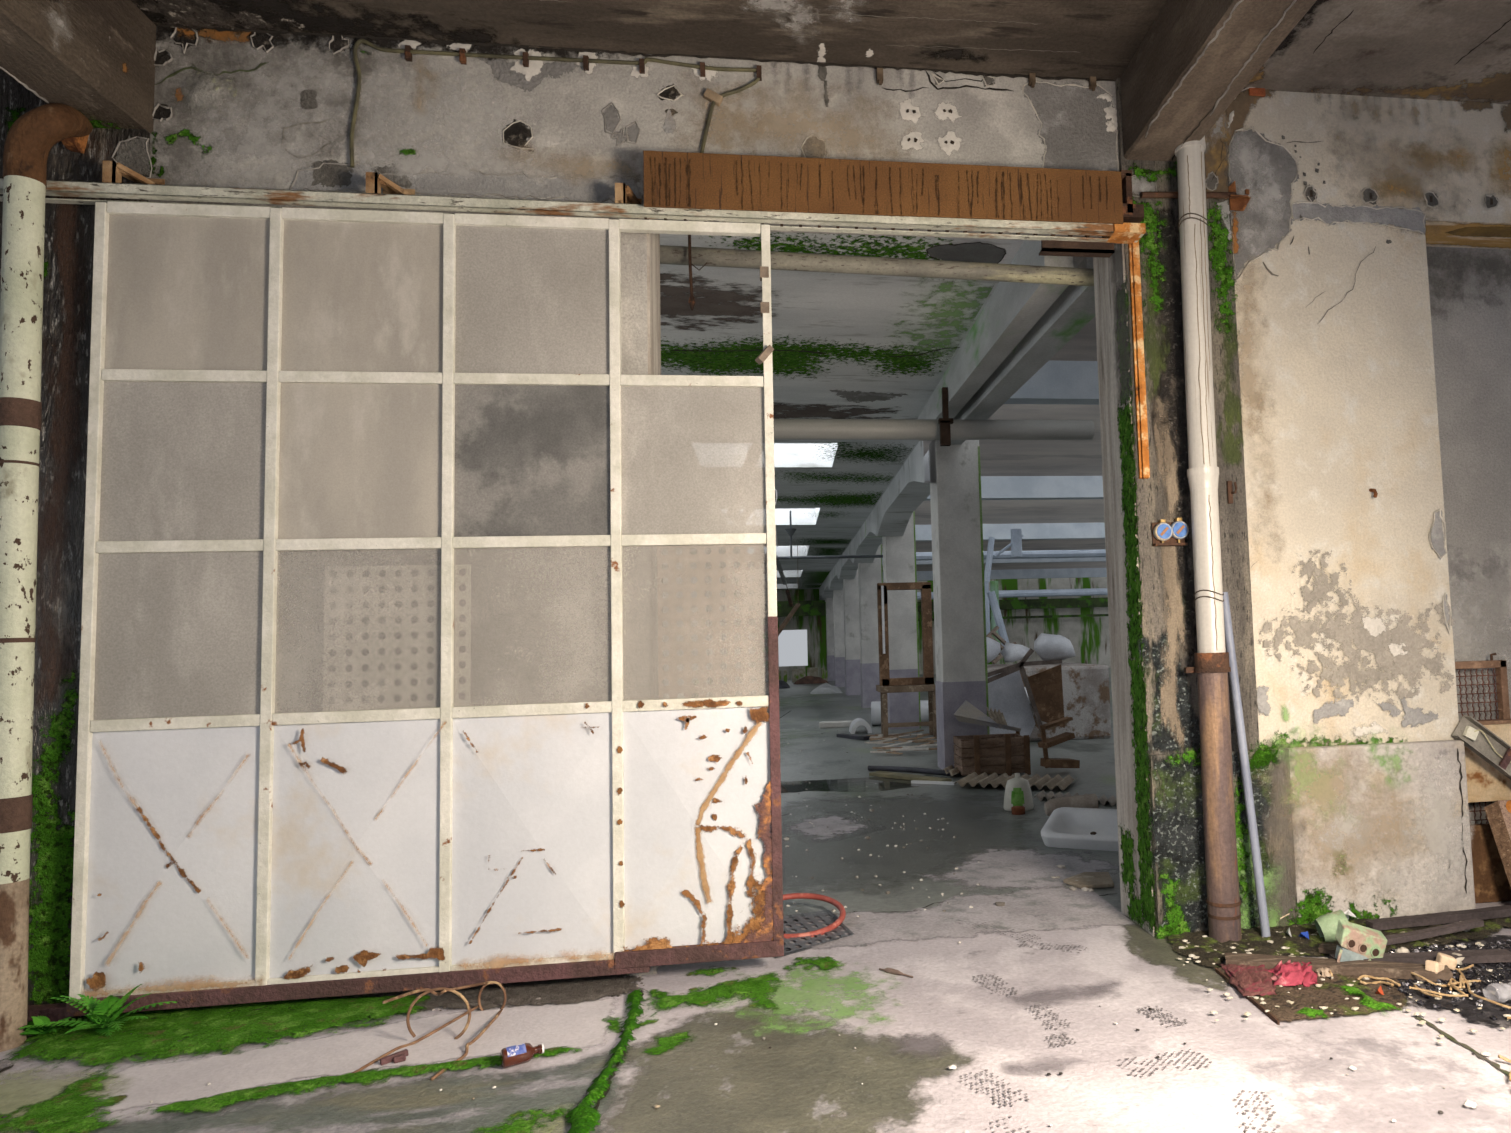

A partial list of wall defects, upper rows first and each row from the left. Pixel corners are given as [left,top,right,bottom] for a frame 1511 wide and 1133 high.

water stain [754,43,874,149]
peeling [1205,87,1440,283]
crack [1305,247,1376,321]
water stain [781,65,1279,991]
peeling [1429,509,1447,560]
corrosion [85,767,201,998]
corrosion [288,728,347,774]
corrosion [284,895,543,980]
corrosion [565,616,784,961]
water stain [1013,983,1118,1004]
water stain [1232,752,1466,929]
peeling [1257,550,1454,783]